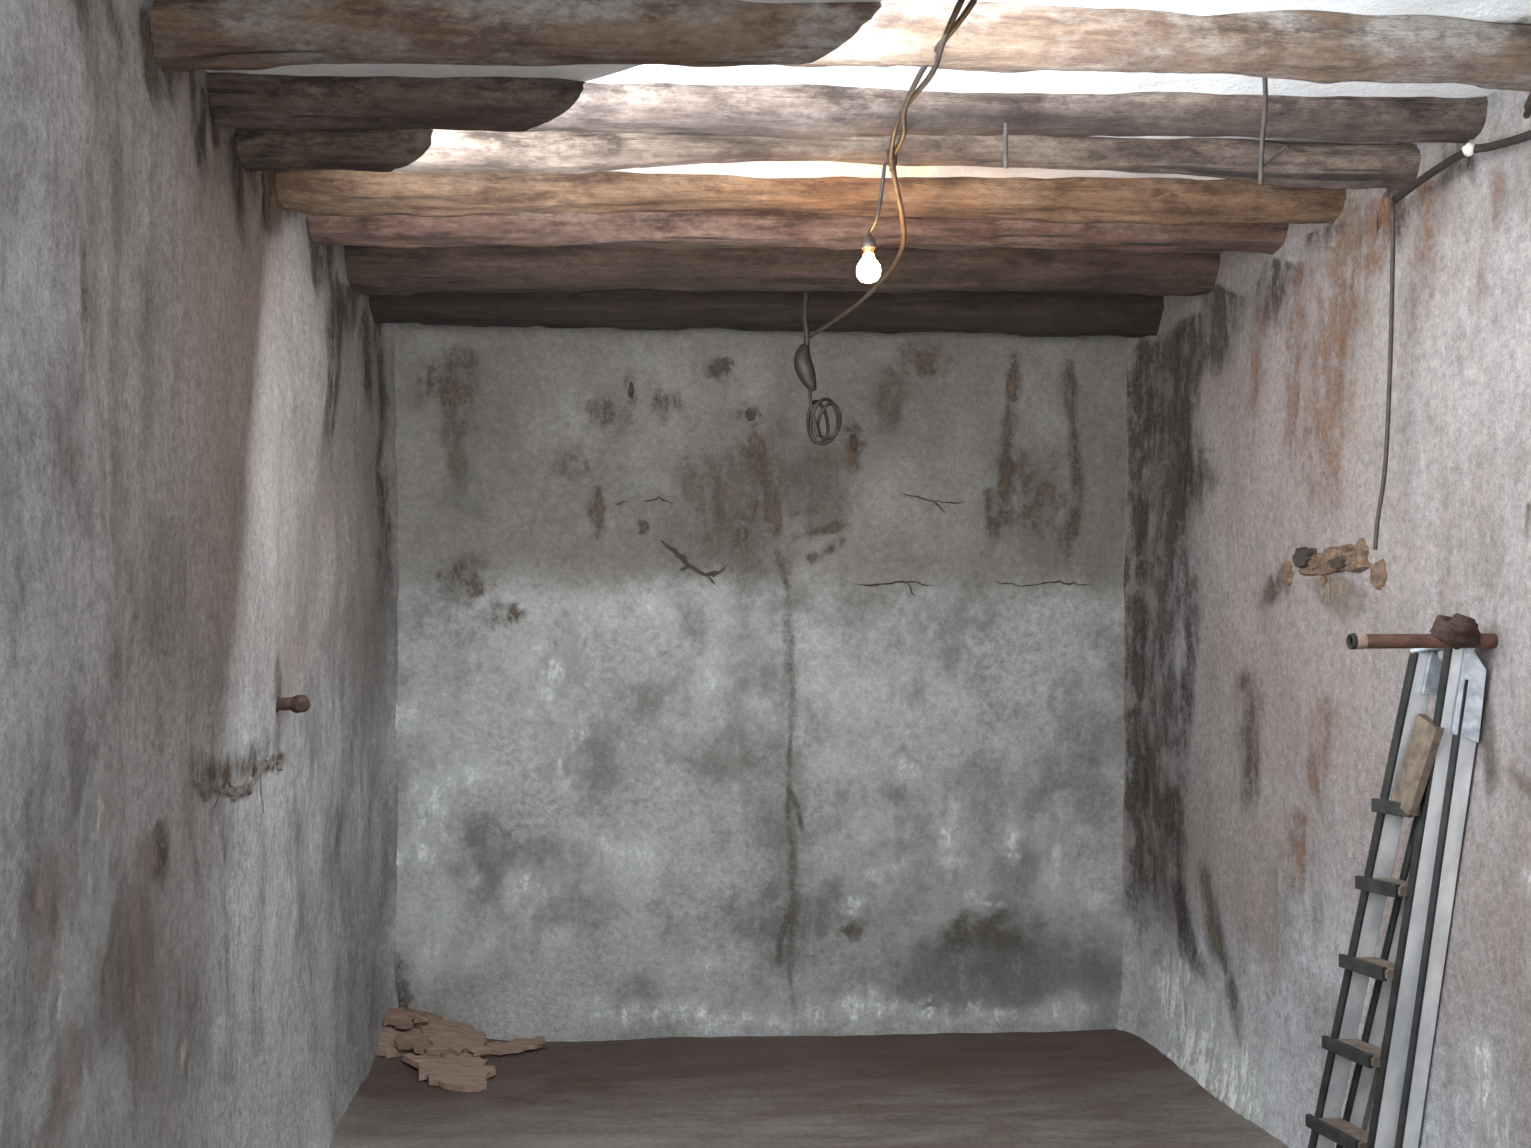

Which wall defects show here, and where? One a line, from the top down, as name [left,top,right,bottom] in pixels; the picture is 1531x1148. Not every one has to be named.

leakage [140,10,391,566]
corrosion [1286,198,1389,482]
crack [614,496,729,585]
leakage [682,433,854,571]
crack [855,580,936,596]
crack [899,492,970,512]
leakage [986,355,1081,541]
crack [997,579,1098,587]
leakage [1124,286,1238,1032]
leakage [1481,703,1493,783]
crack [778,790,803,980]
leakage [593,887,1087,1034]